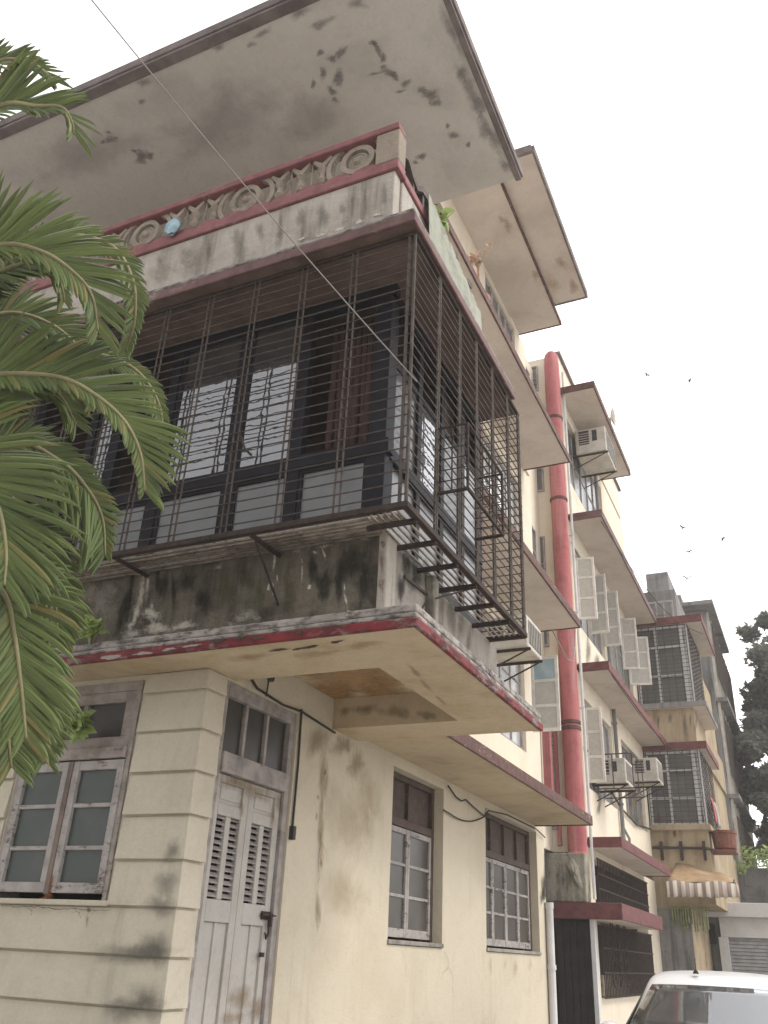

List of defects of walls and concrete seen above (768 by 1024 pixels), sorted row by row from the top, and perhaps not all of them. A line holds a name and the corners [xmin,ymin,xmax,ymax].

leakage [311,49,345,101]
leakage [371,41,440,105]
leakage [118,571,209,638]
peeling [101,612,264,660]
leakage [301,549,369,612]
leakage [399,553,428,600]